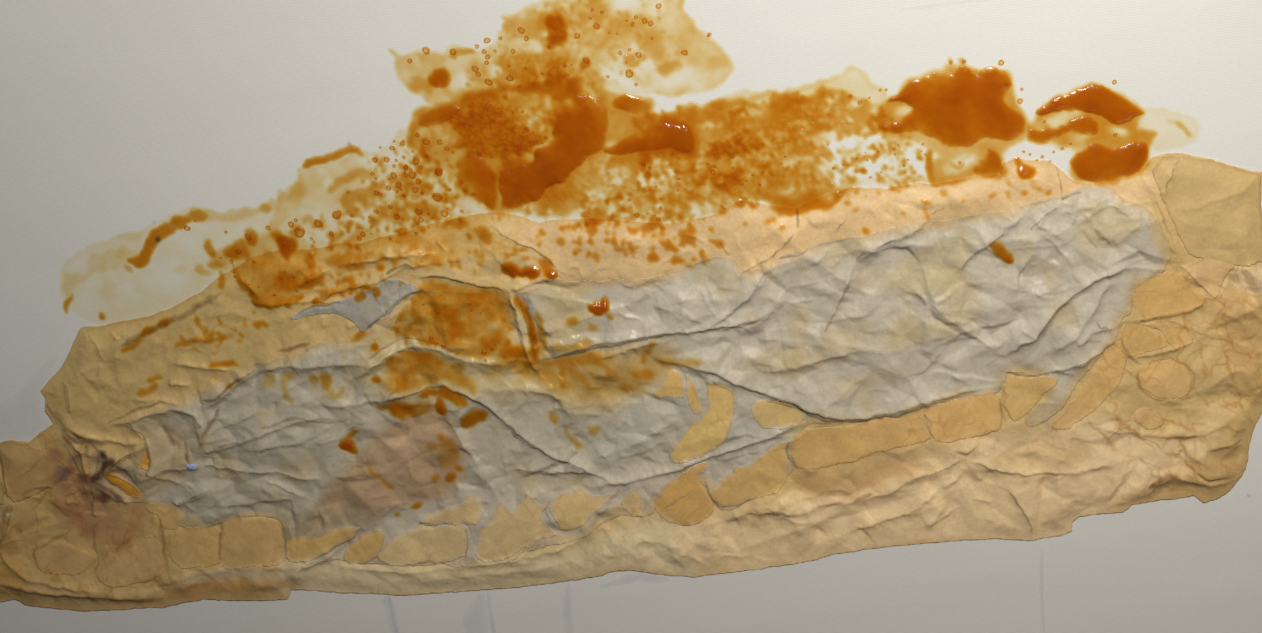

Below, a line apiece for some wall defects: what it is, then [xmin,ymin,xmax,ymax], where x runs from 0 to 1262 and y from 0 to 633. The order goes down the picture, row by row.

corrosion [503,264,555,278]
corrosion [589,299,608,315]